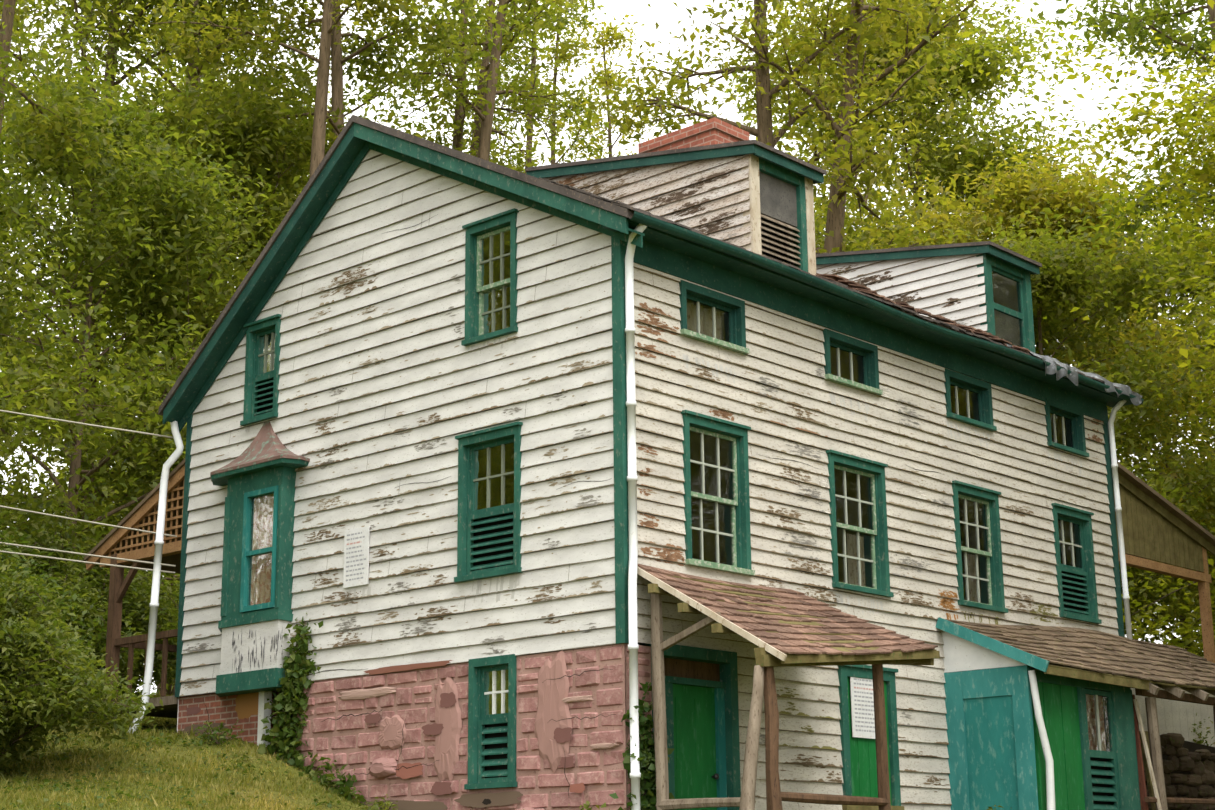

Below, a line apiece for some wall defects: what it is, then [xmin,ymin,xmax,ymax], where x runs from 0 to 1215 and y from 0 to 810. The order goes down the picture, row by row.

peeling [651,169,737,243]
peeling [308,264,378,347]
peeling [635,302,679,359]
peeling [825,264,922,302]
peeling [638,445,658,496]
peeling [759,440,840,606]
peeling [310,570,364,647]
peeling [376,564,456,638]
peeling [527,584,566,634]
peeling [890,554,960,619]
peeling [1006,592,1064,625]
peeling [232,620,307,673]